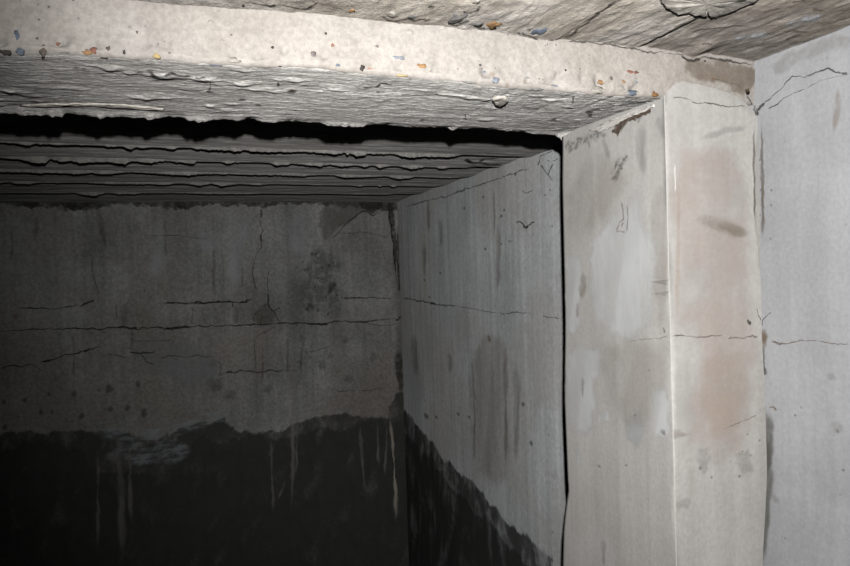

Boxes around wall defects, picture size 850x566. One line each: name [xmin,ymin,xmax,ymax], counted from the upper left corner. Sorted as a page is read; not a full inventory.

crack [565,3,847,115]
crack [4,295,380,368]
damp [0,355,538,566]